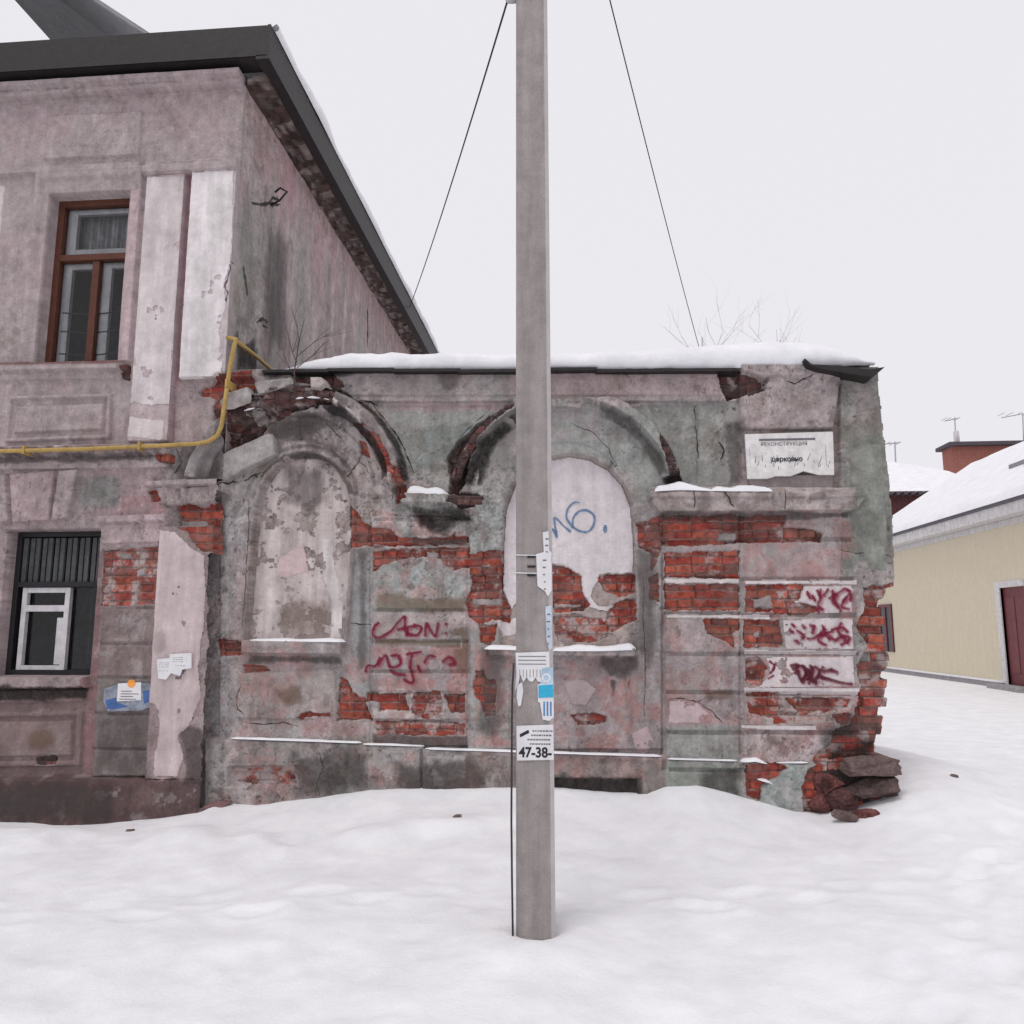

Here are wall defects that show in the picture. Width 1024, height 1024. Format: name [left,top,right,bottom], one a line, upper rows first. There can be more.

peeling [119,170,407,504]
flaking render [446,404,514,510]
flaking render [717,371,766,401]
peeling [103,502,224,777]
peeling [252,458,516,645]
flaking render [297,670,497,736]
crack [673,697,722,722]
flaking render [551,457,894,812]